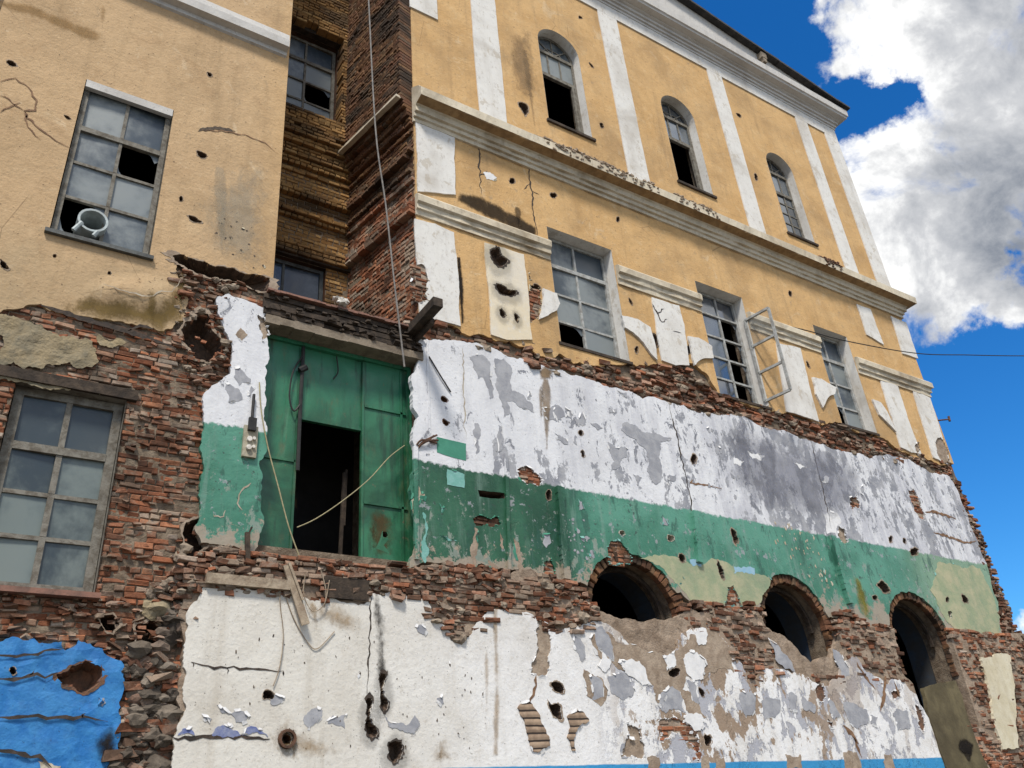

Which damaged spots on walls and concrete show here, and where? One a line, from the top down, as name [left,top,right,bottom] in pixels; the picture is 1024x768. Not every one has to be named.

crack [0,78,68,147]
crack [201,129,272,149]
crack [478,148,495,194]
crack [525,169,538,235]
spalling [535,134,721,220]
flaking render [0,218,926,768]
crack [669,406,720,511]
peeling [425,320,1024,768]
crack [365,597,373,684]